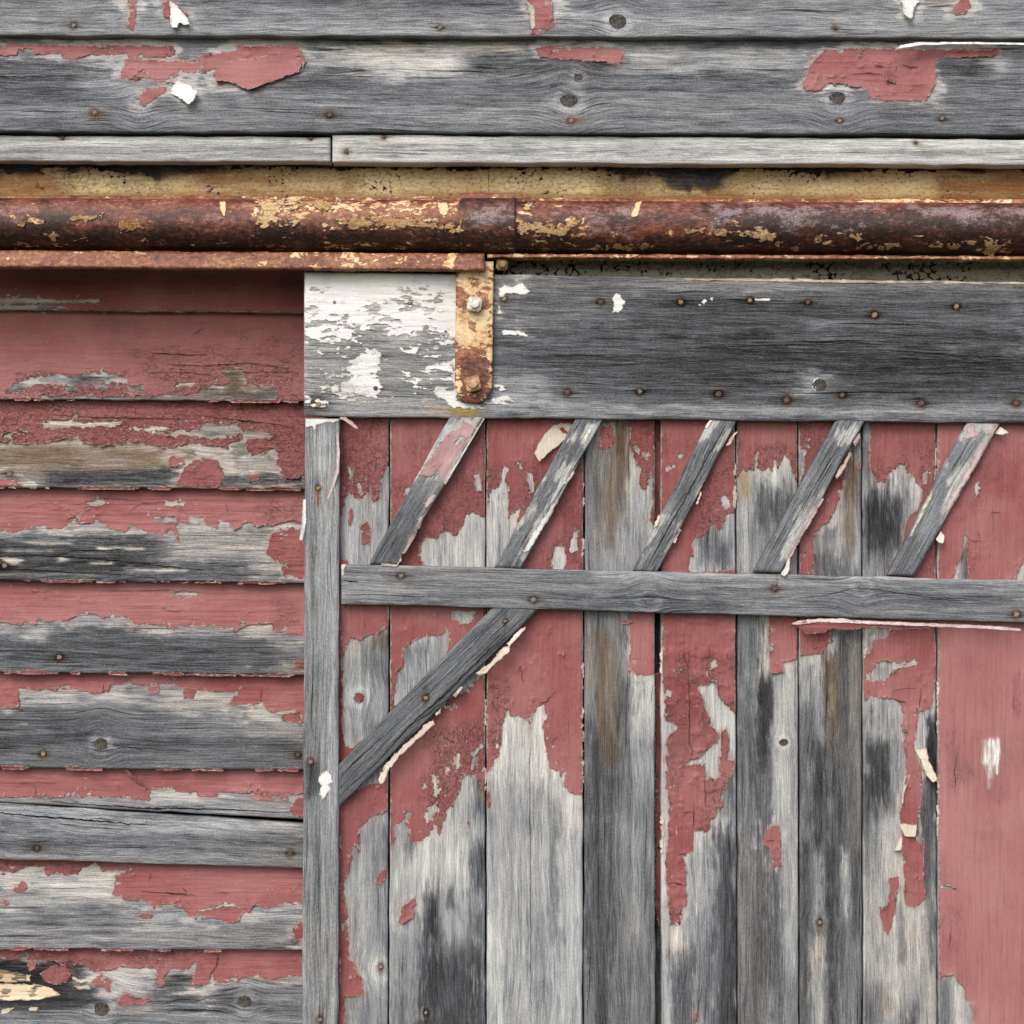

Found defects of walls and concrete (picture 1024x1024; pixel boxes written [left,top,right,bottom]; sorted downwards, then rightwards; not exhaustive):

peeling [0,43,307,107]
peeling [803,42,1024,103]
peeling [0,165,1024,314]
peeling [0,269,575,636]
peeling [519,456,585,570]
peeling [0,661,304,724]
peeling [0,765,303,818]
peeling [339,603,585,1024]
peeling [621,612,736,927]
peeling [768,616,1024,1024]
peeling [0,859,303,923]
peeling [0,921,303,1007]